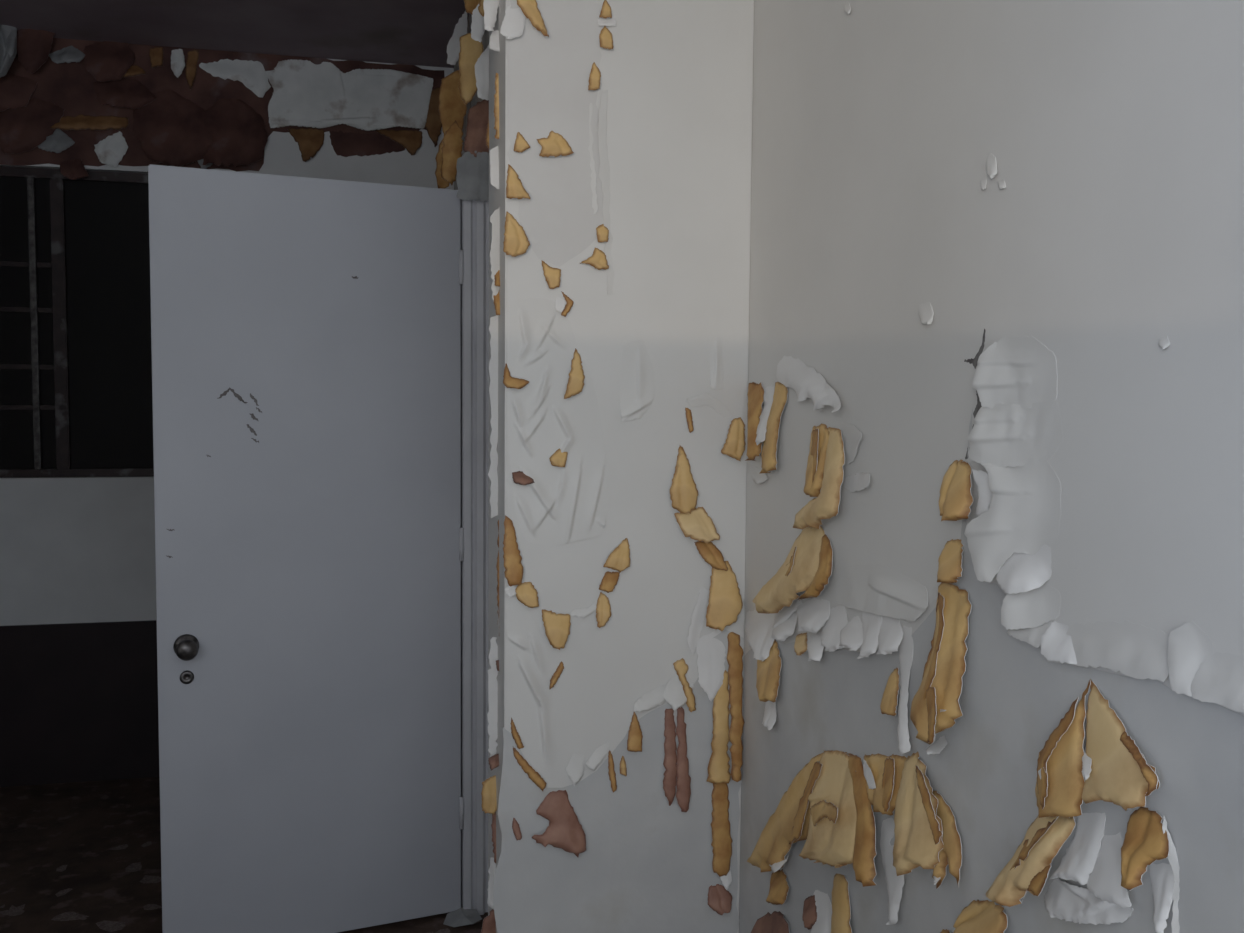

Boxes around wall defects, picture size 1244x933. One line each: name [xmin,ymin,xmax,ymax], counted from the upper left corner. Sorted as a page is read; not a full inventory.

peeling [0,0,630,689]
peeling [481,336,1244,933]
crack [964,329,986,459]